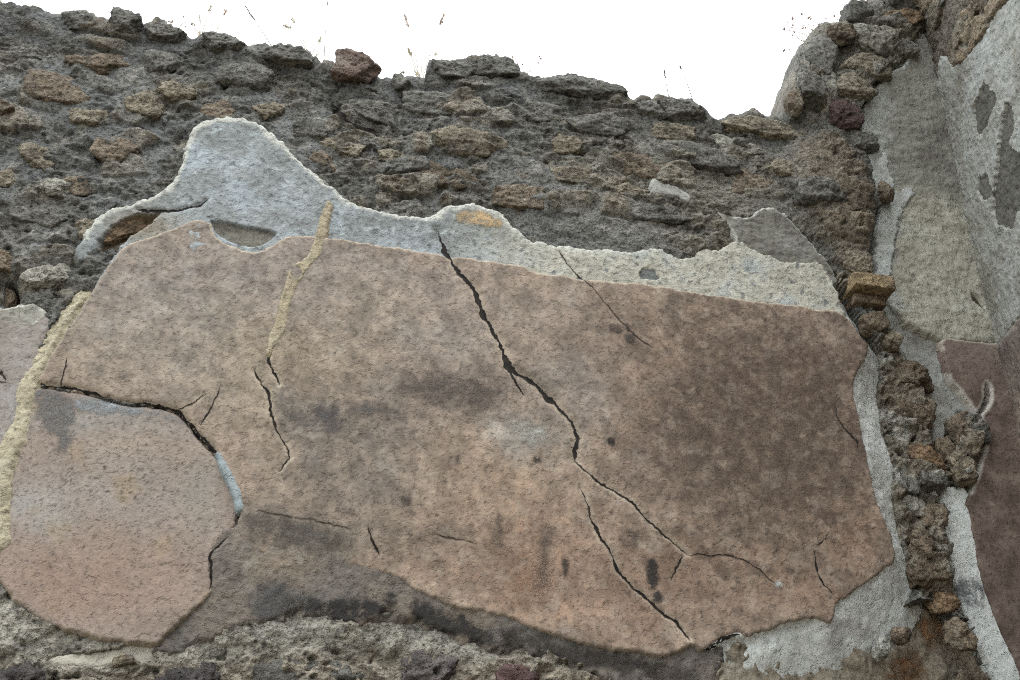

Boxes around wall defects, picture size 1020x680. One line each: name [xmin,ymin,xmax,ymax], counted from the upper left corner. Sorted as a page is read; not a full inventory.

spalling [976,84,997,134]
spalling [978,104,1020,229]
spalling [212,223,275,247]
spalling [639,269,659,280]
crack [41,358,220,454]
crack [254,358,290,472]
crack [438,231,776,651]
crack [262,510,379,554]
crack [208,536,229,587]